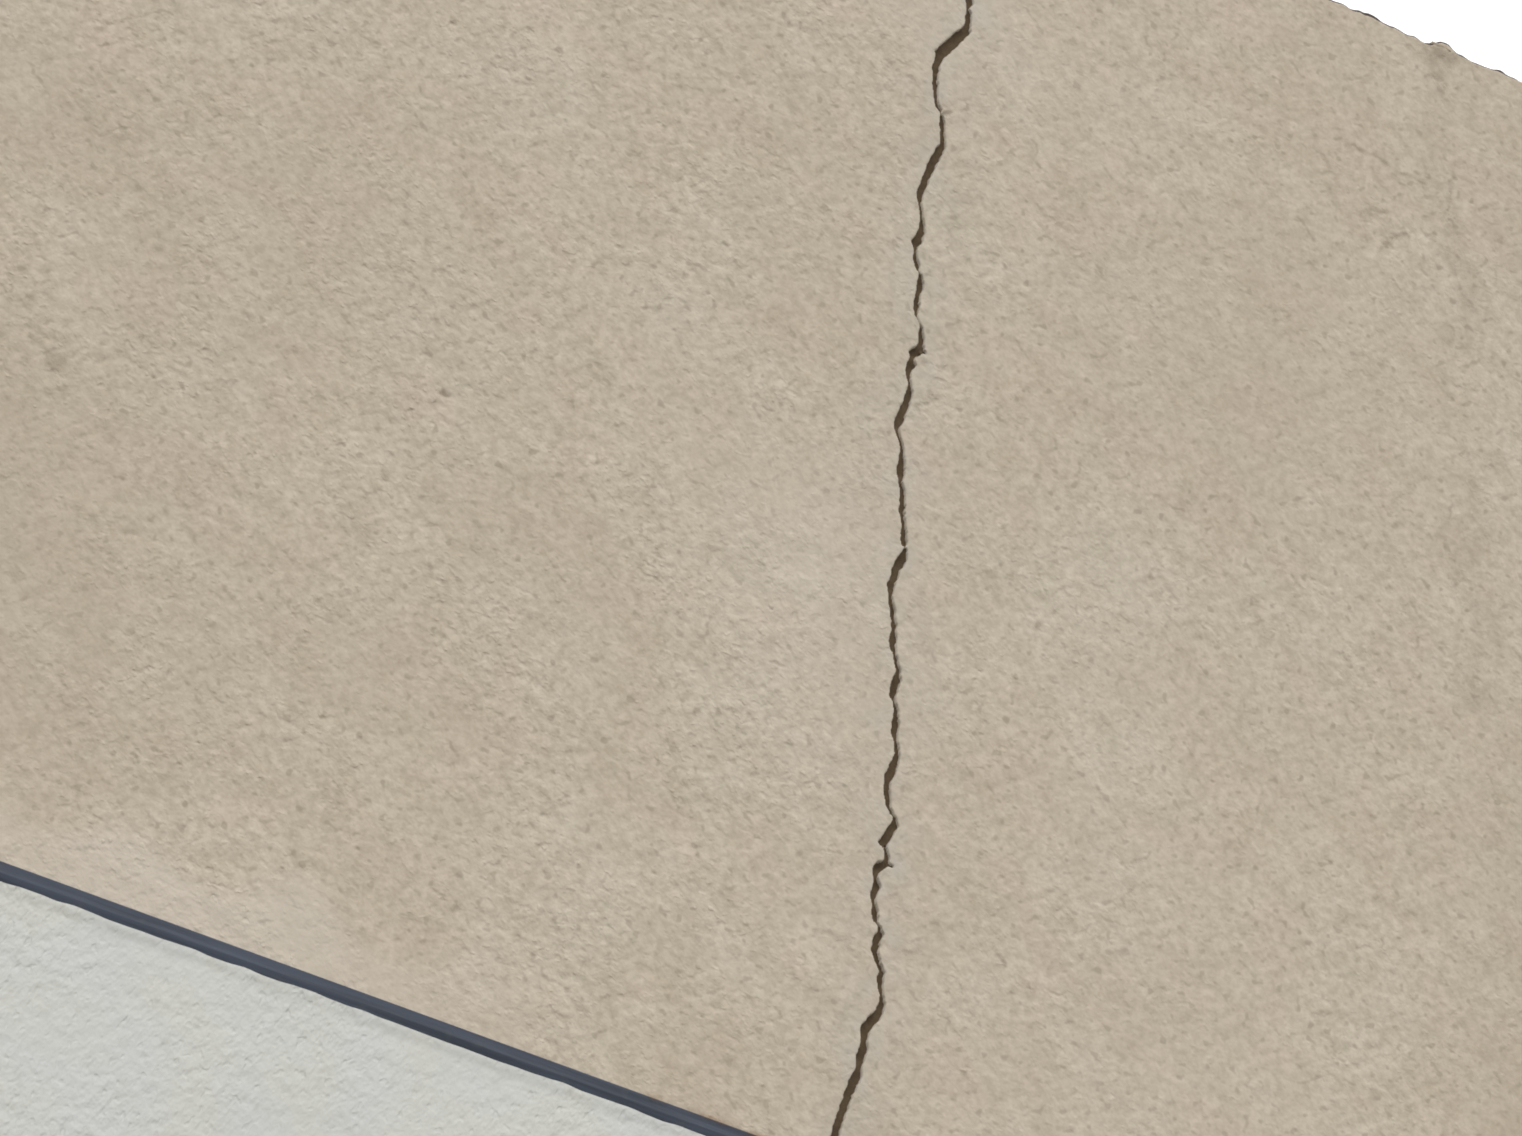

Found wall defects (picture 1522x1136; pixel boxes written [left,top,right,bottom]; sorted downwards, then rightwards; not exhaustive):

crack [831,0,972,1136]